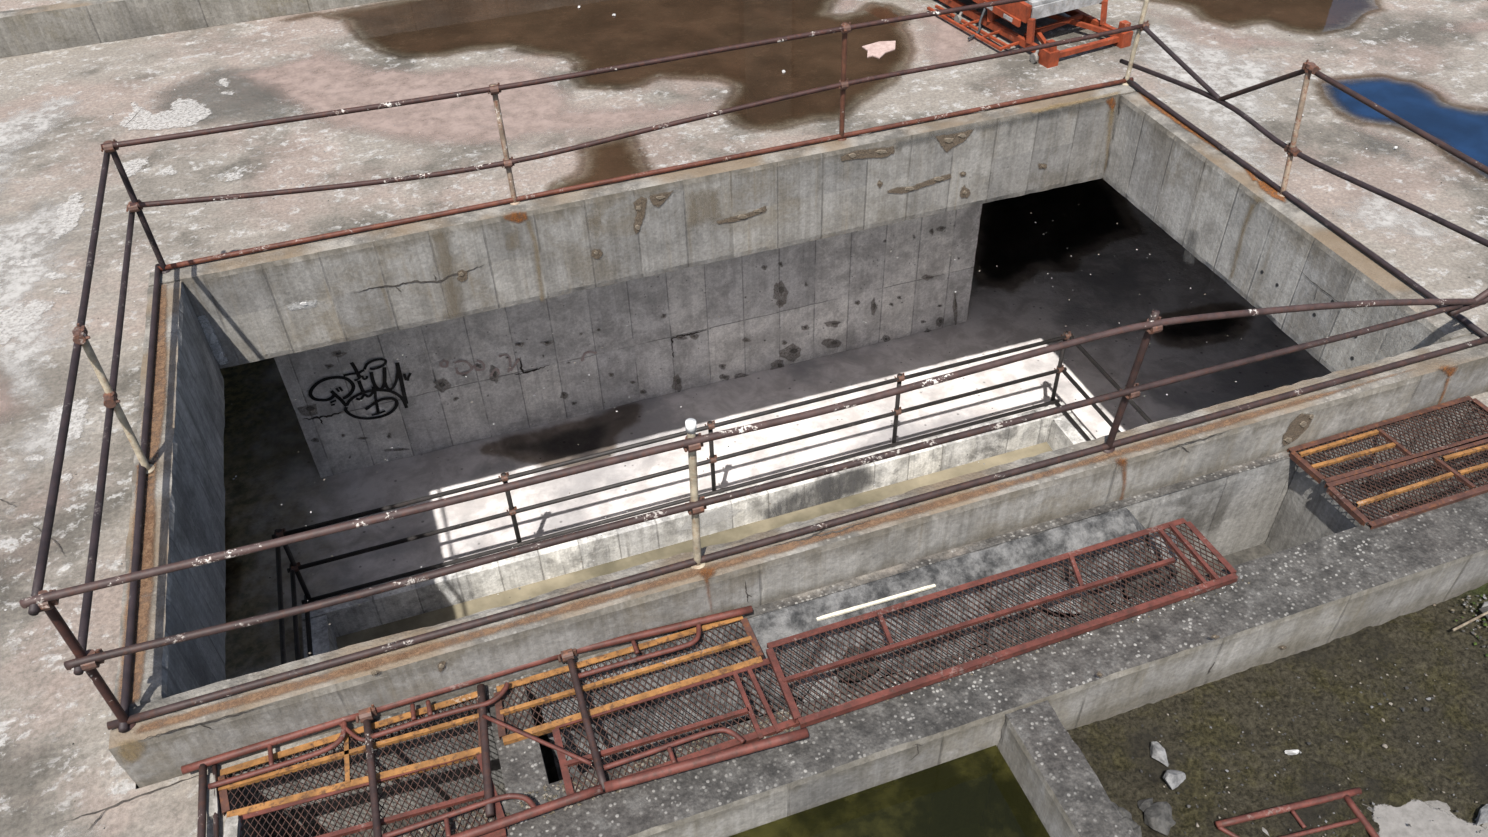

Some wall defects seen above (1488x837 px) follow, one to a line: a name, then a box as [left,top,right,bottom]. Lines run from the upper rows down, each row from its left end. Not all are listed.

leakage [921,16,975,64]
leakage [163,55,707,143]
spalling [877,172,970,198]
spalling [633,191,673,234]
spalling [717,206,767,224]
rust [1440,366,1456,401]
spalling [1283,414,1314,446]
rust [121,375,1394,760]